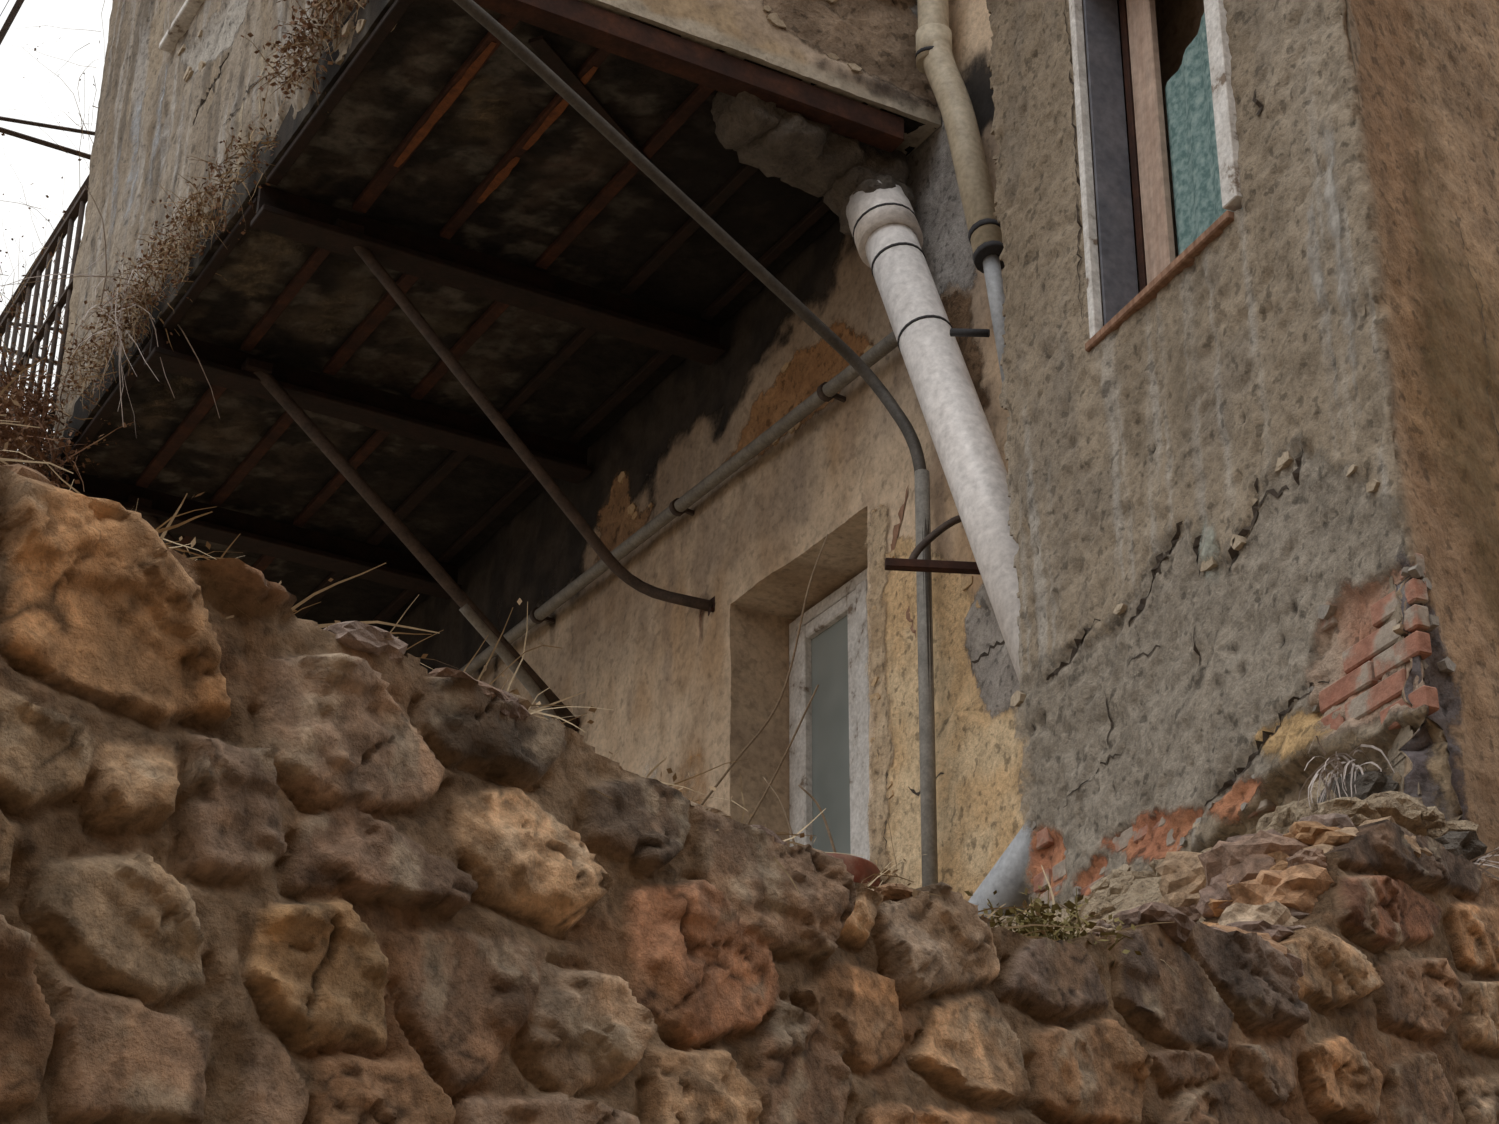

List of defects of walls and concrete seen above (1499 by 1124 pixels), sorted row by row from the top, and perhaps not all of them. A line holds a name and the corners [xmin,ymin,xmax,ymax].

flaking render [763,0,938,107]
peeling [724,321,873,463]
crack [1046,447,1303,683]
crack [1063,691,1122,808]
peeling [866,434,1487,914]
crack [1204,681,1329,807]